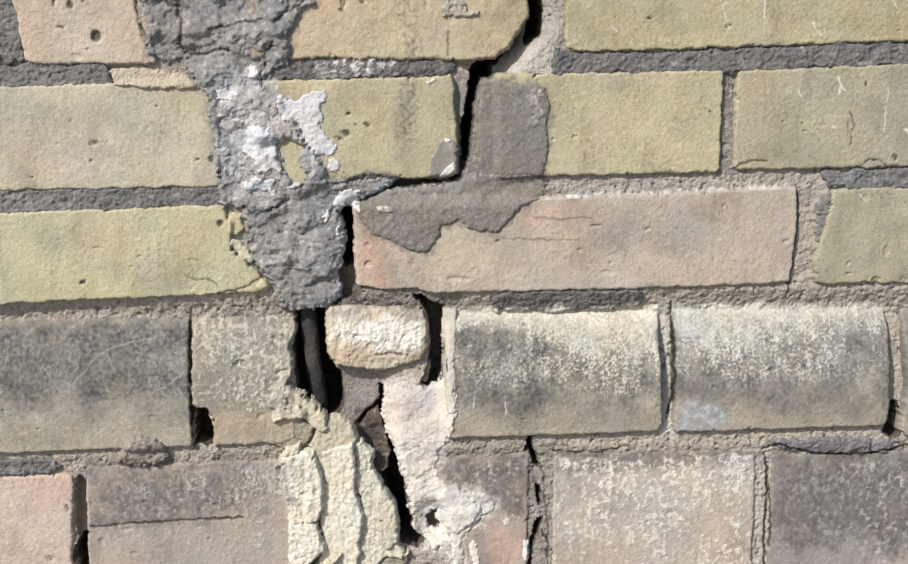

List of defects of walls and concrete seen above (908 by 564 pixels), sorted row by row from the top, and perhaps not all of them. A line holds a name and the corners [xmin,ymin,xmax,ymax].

peeling [316,57,396,78]
crack [522,0,543,45]
peeling [198,113,283,193]
peeling [276,89,355,173]
peeling [322,188,361,236]
crack [338,54,503,302]
crack [187,310,195,446]
spalling [292,310,311,398]
spalling [316,307,346,413]
crack [411,293,446,386]
crack [355,382,425,548]
peeling [380,307,510,564]